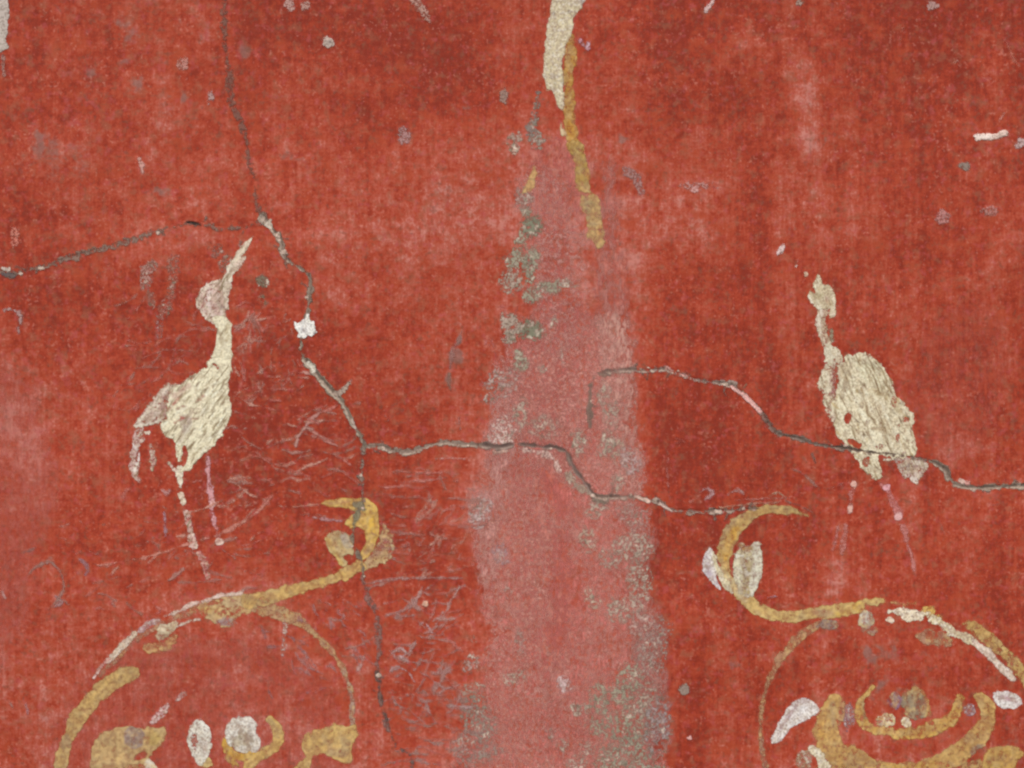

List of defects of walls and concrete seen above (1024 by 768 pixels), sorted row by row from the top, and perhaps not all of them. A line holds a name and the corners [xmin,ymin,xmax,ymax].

crack [0,0,759,768]
peeling [498,187,577,304]
leakage [449,137,672,768]
crack [586,363,1024,492]